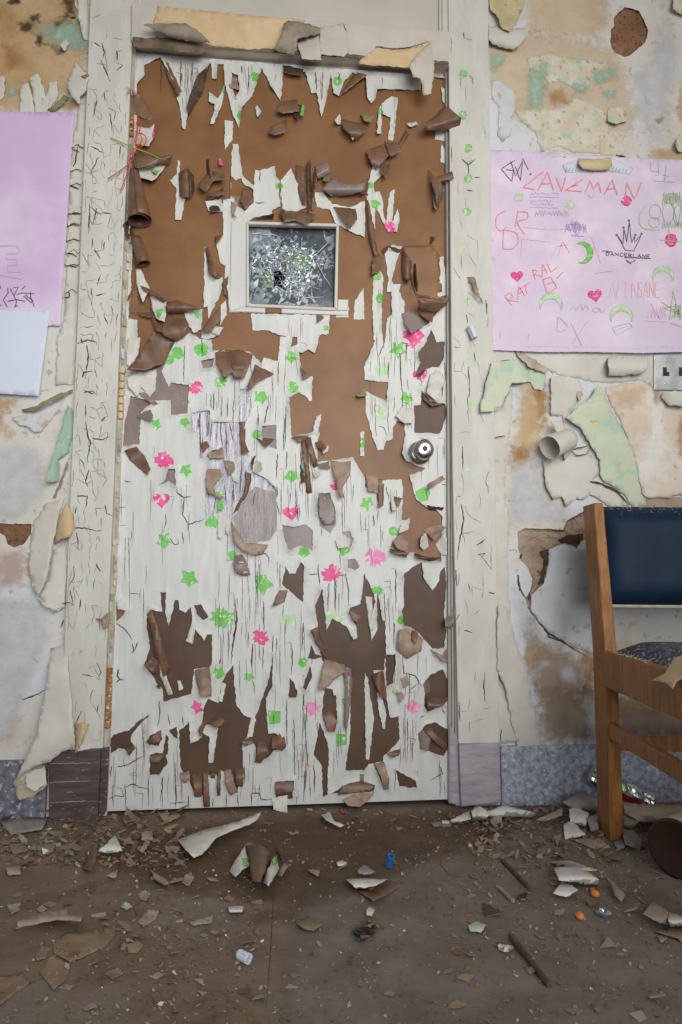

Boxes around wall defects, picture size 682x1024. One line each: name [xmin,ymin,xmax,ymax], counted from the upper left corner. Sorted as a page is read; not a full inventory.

peeling [75,0,90,41]
peeling [488,0,526,50]
peeling [491,7,648,171]
peeling [673,0,682,15]
peeling [0,61,89,612]
crack [51,15,502,809]
peeling [111,6,461,807]
crack [370,148,585,656]
peeling [96,525,125,676]
peeling [480,350,682,746]
peeling [271,780,294,813]